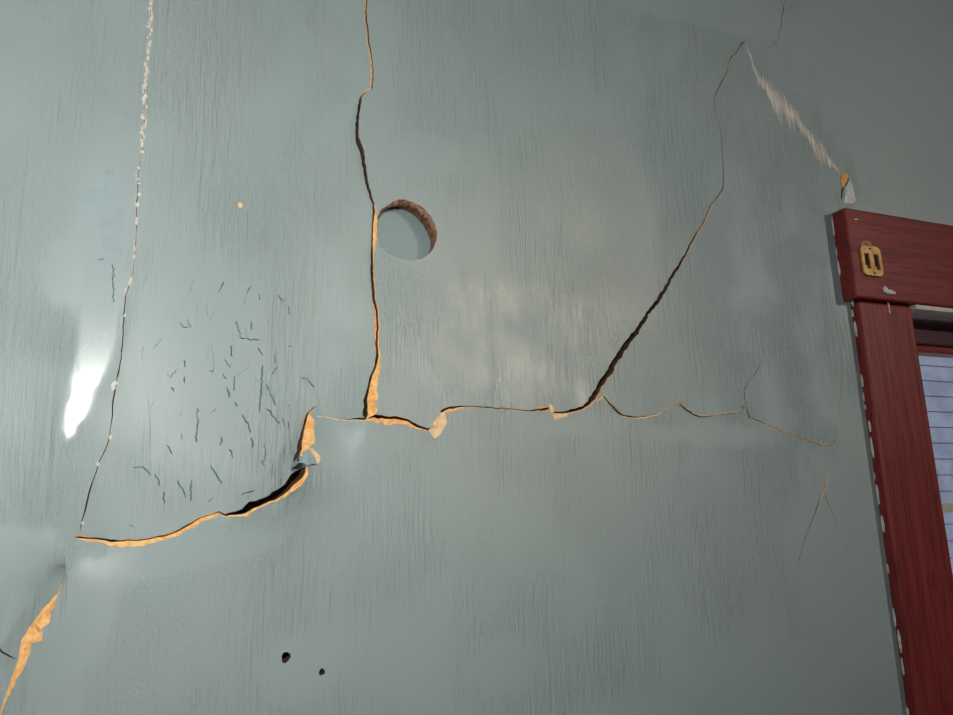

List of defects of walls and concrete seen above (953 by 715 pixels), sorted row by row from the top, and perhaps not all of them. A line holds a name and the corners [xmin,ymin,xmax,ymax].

peeling [746,45,856,204]
crack [74,0,856,547]
crack [0,583,62,715]